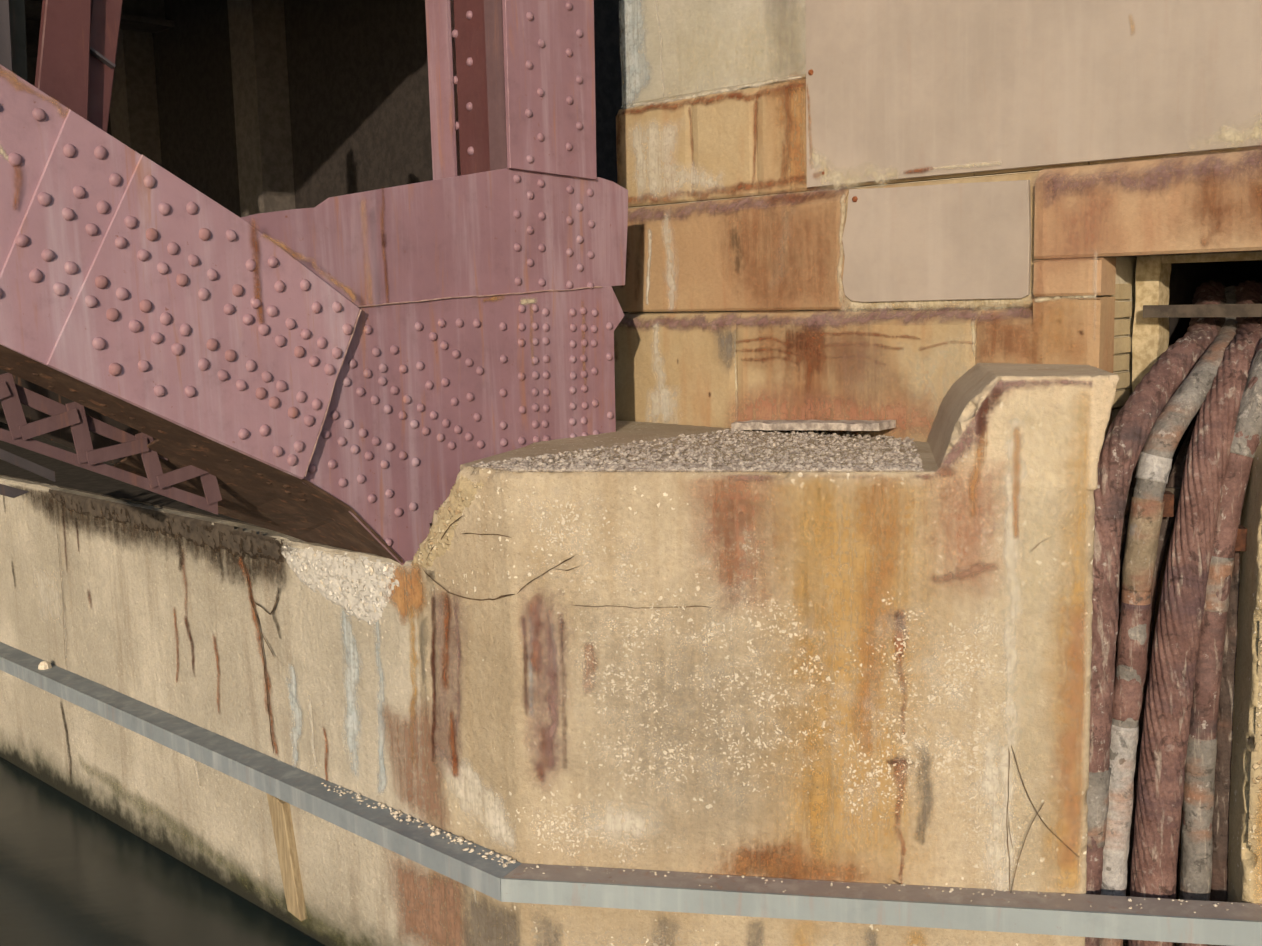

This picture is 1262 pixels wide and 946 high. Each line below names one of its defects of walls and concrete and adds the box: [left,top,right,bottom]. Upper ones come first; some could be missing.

rust [619,307,1033,433]
leakage [16,486,288,583]
crack [423,515,582,637]
rust [917,380,1092,581]
rust [389,567,460,776]
rust [523,598,563,780]
rust [732,482,914,882]
crack [1005,747,1013,891]